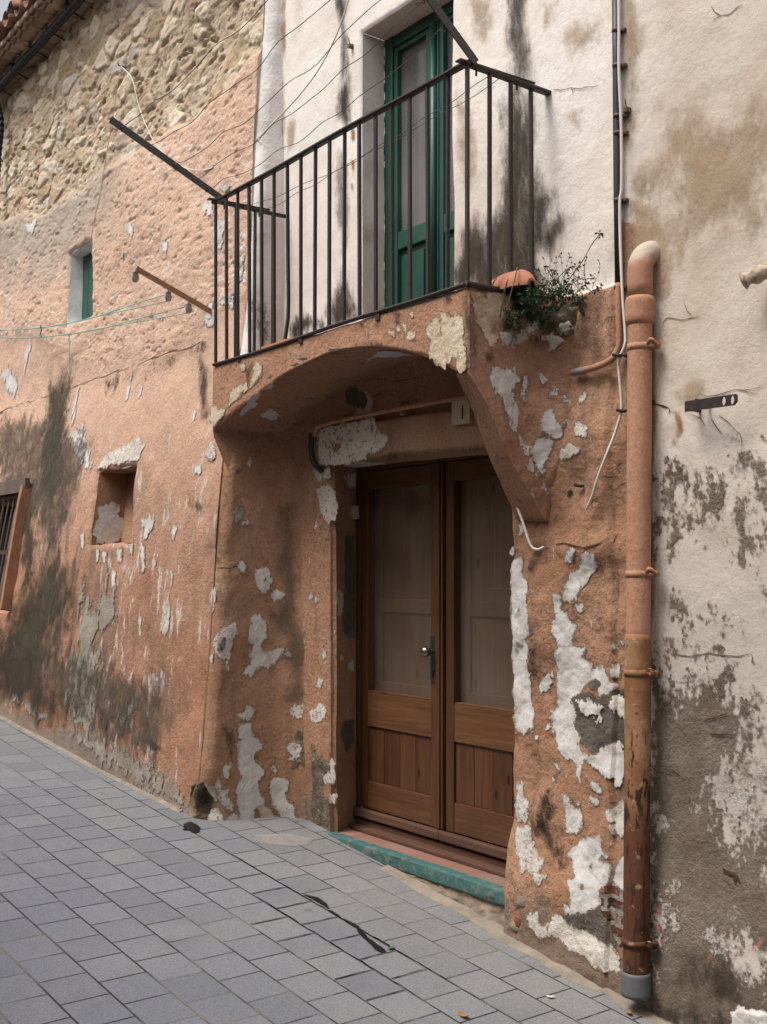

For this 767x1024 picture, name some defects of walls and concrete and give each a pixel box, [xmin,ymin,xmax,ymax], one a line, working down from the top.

leakage [336,0,350,124]
leakage [621,0,639,62]
leakage [446,0,564,301]
leakage [624,103,767,297]
peeling [388,291,578,373]
peeling [313,385,388,529]
peeling [490,366,588,494]
peeling [651,450,767,600]
leakage [0,643,57,727]
peeling [65,501,338,827]
peeling [509,522,625,977]
peeling [631,586,767,1024]